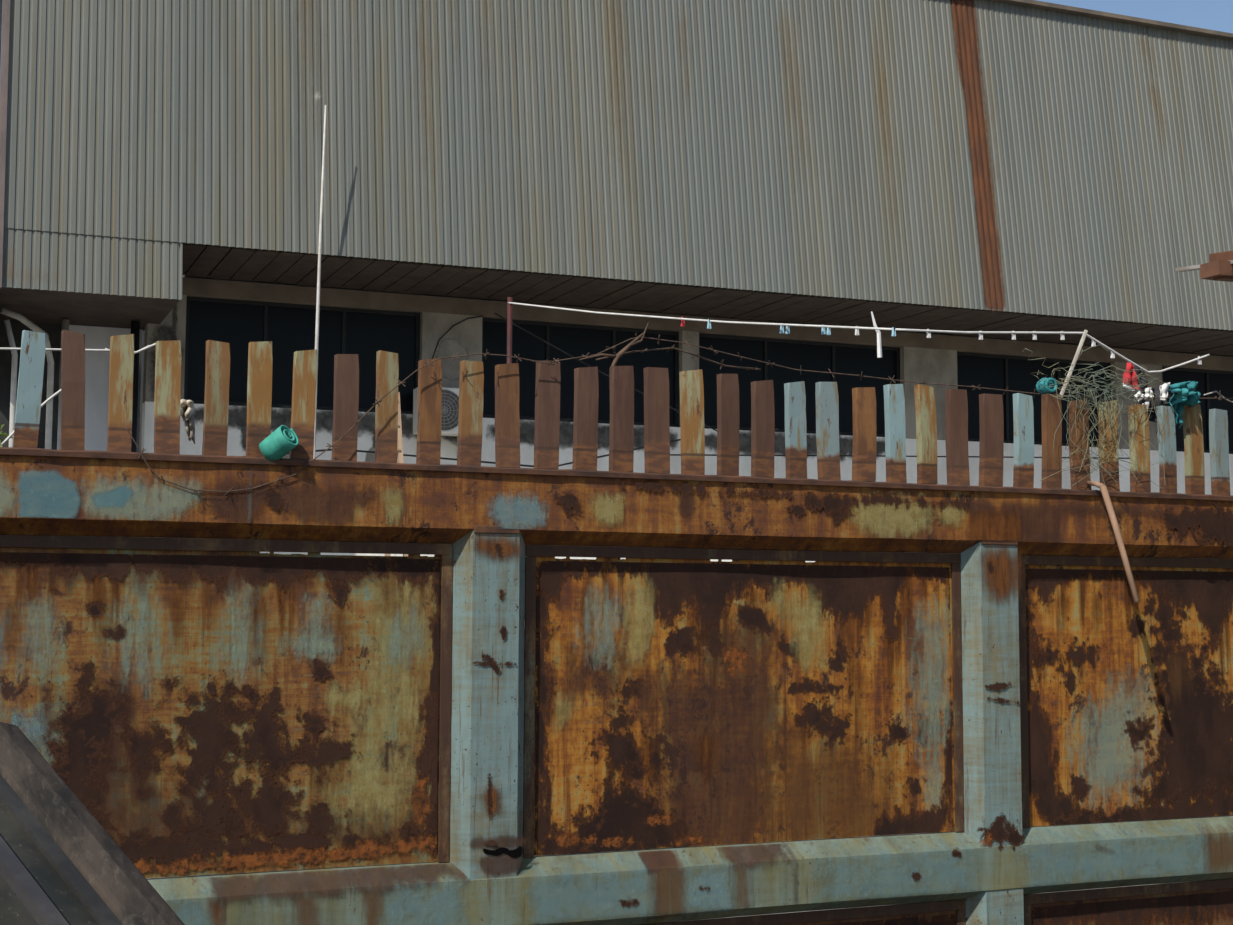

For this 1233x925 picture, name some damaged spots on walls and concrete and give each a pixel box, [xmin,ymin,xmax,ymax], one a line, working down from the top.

corrosion [950,0,1004,310]
corrosion [206,480,374,525]
corrosion [554,489,582,517]
corrosion [619,480,1233,546]
corrosion [0,552,440,875]
corrosion [534,561,953,915]
corrosion [982,548,1233,825]
corrosion [977,813,1025,851]
corrosion [1031,891,1233,925]